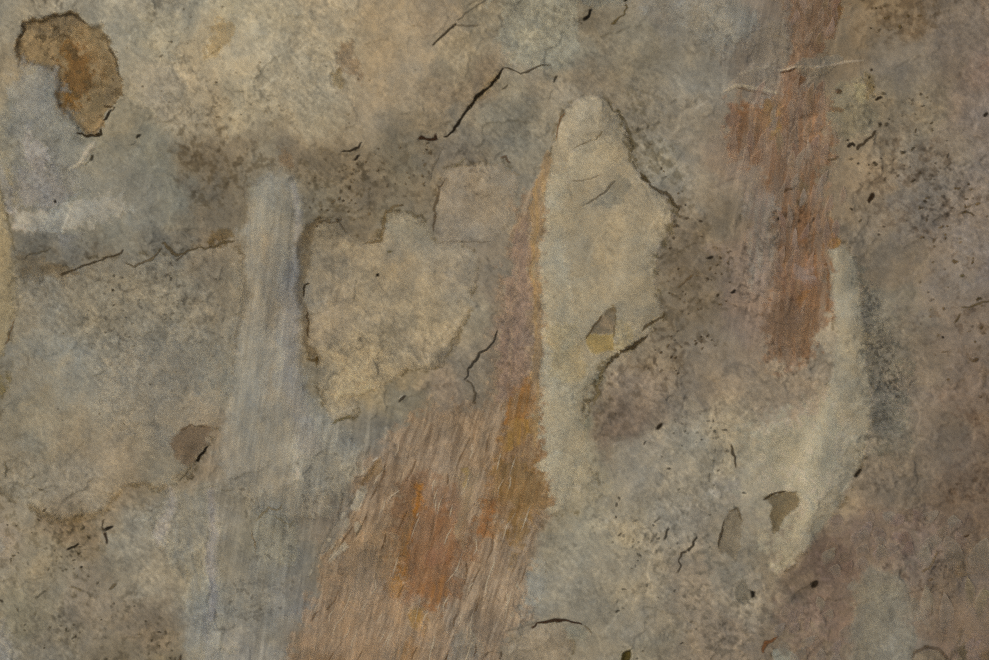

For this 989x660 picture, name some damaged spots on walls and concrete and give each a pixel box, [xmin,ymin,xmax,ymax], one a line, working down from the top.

crack [432,0,485,45]
flaking render [15,11,122,138]
crack [418,64,557,141]
rust [724,0,842,376]
crack [25,235,234,275]
flaking render [587,308,616,353]
crack [465,331,498,403]
rust [288,151,554,660]
flaking render [171,420,211,465]
flaking render [718,507,743,560]
flaking render [764,491,799,532]
crack [532,618,582,628]